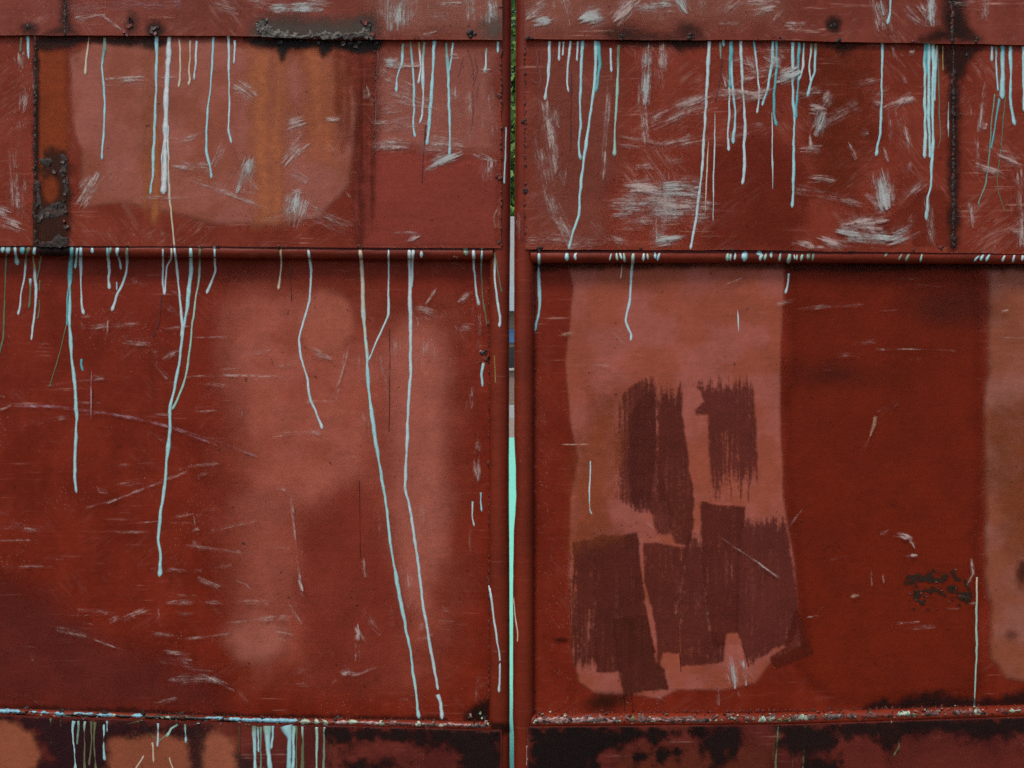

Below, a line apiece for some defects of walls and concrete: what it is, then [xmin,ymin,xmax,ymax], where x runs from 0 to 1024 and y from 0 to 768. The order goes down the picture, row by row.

corrosion [35,49,72,248]
corrosion [255,17,379,164]
peeling [905,569,972,610]